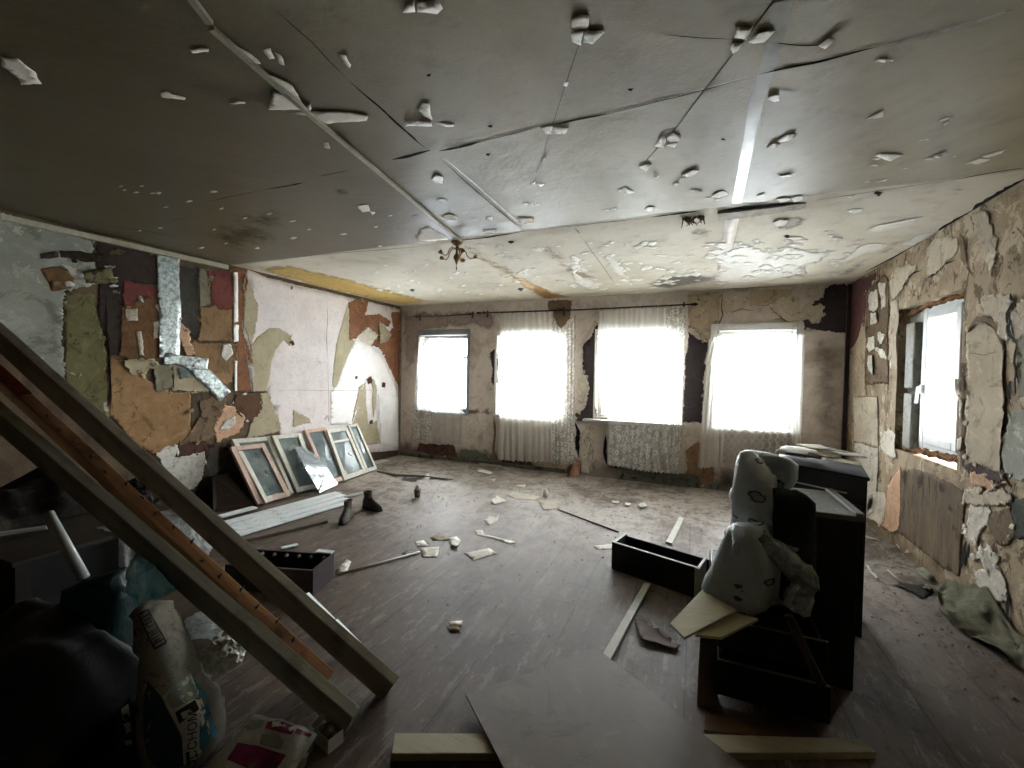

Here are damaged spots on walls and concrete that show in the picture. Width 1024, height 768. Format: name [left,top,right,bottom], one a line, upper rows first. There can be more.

crack [212,170,348,201]
crack [278,12,1024,297]
flaking render [180,297,238,386]
leakage [483,258,558,298]
peeling [557,216,958,488]
crack [715,282,836,324]
flaking render [106,358,207,490]
flaking render [213,390,254,446]
spalling [954,378,964,420]
spalling [866,427,1024,602]